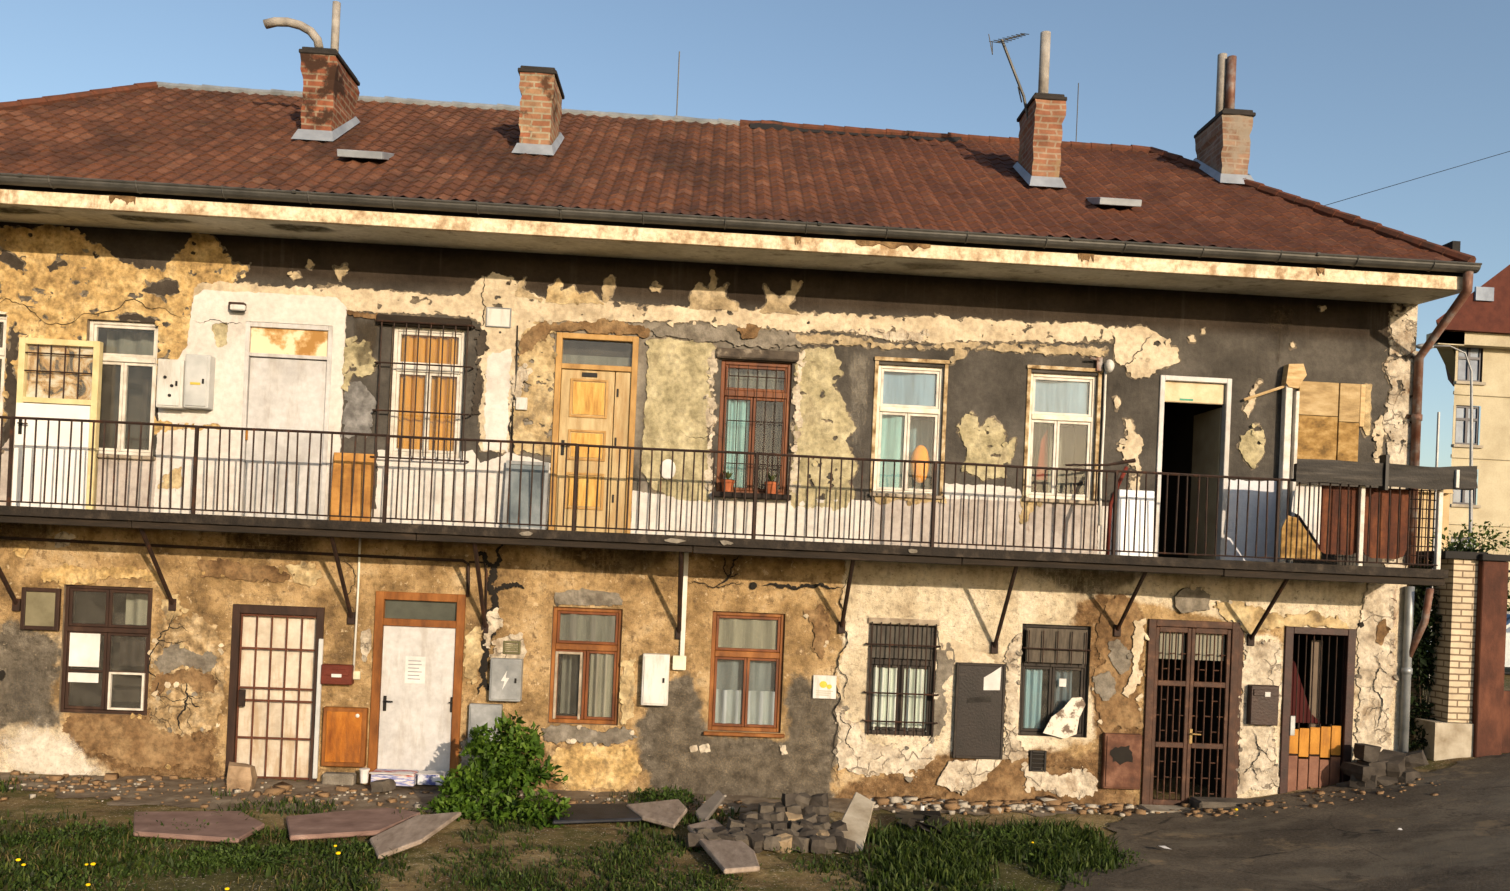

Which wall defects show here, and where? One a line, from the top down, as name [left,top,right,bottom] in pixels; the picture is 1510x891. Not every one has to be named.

peeling [0,224,1181,506]
spalling [1236,378,1266,470]
spalling [1360,303,1419,463]
spalling [13,541,30,558]
spalling [1019,495,1043,524]
spalling [41,531,227,773]
spalling [689,743,711,753]
spalling [832,631,1134,806]
spalling [1089,593,1150,733]